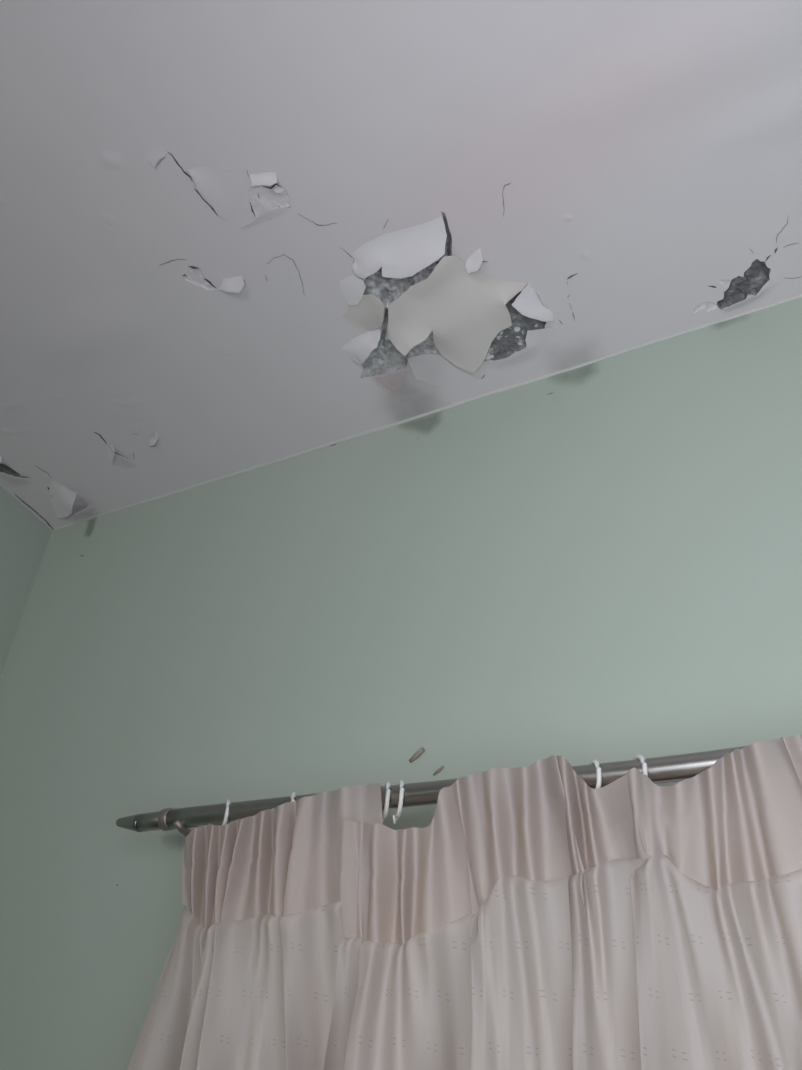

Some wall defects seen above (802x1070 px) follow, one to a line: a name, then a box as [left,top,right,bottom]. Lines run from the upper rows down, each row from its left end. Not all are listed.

peeling [240,172,335,231]
peeling [159,259,245,293]
peeling [339,212,561,400]
spalling [691,220,800,315]
peeling [0,456,95,521]